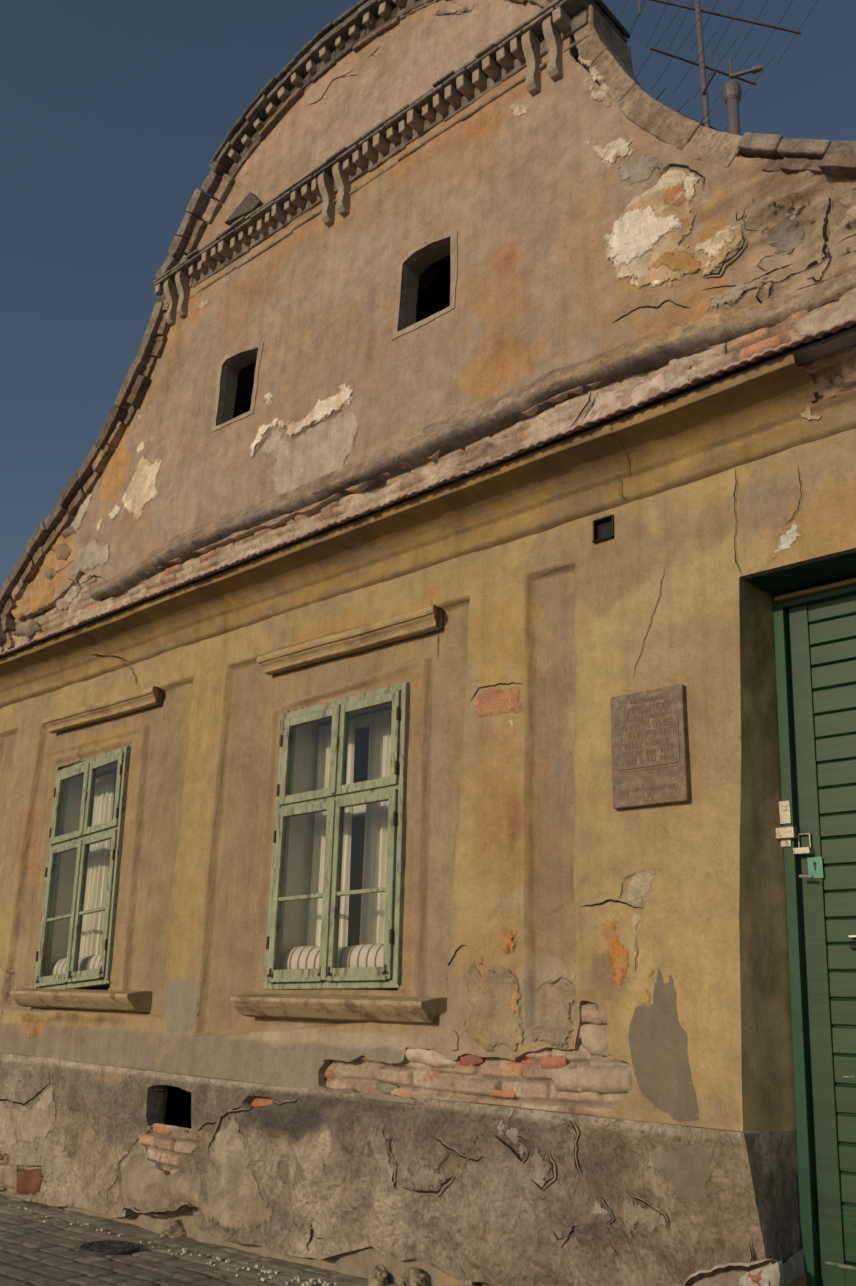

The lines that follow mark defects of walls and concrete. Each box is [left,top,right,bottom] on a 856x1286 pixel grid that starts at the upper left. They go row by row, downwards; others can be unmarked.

crack [311,47,379,104]
crack [614,186,856,322]
flaking render [13,161,856,648]
crack [734,469,742,574]
crack [632,575,664,678]
flaking render [0,1086,57,1195]
flaking render [139,1123,197,1174]
flaking render [201,1116,275,1232]
crack [400,1105,485,1191]
flaking render [324,1001,632,1197]
crack [683,1243,773,1286]
flaking render [692,1249,807,1286]